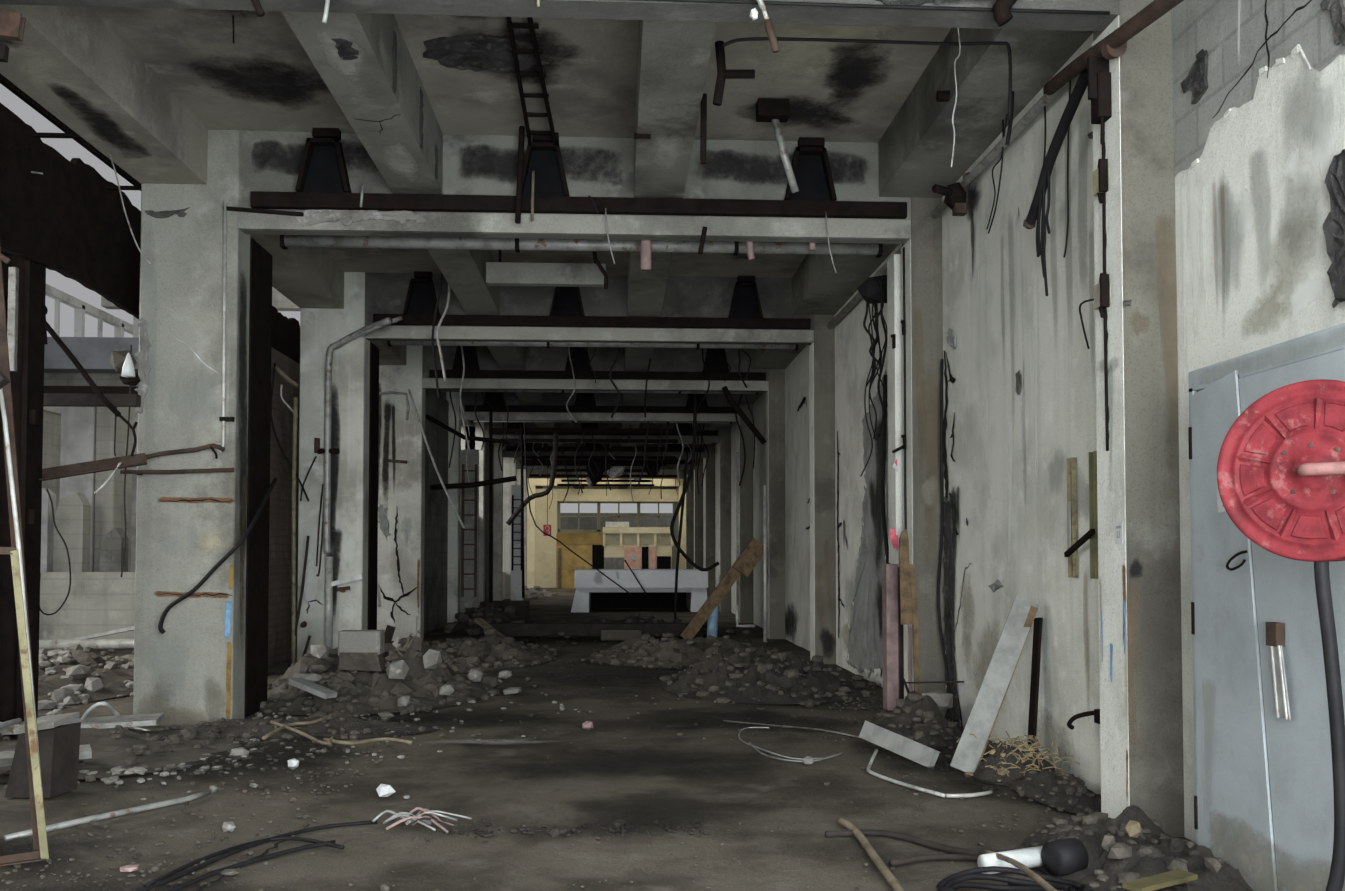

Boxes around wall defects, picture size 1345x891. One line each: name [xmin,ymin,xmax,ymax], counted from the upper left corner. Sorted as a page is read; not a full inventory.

flaking render [1173,0,1345,177]
crack [378,506,417,623]
flaking render [846,370,888,677]
crack [196,824,309,891]